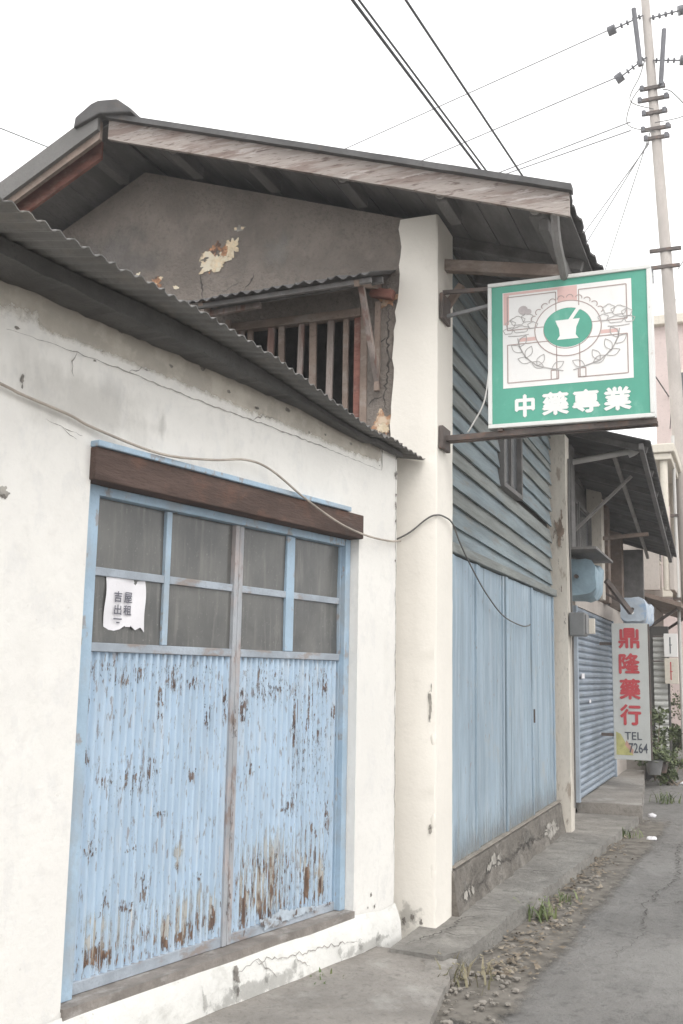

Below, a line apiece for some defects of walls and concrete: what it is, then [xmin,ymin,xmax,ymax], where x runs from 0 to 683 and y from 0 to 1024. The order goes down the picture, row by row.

spalling [199,225,246,274]
flaking render [371,408,391,434]
spalling [524,820,559,849]
corrosion [208,846,275,934]
corrosion [300,854,324,905]
spalling [487,852,502,873]
corrosion [83,919,109,970]
corrosion [160,900,189,952]
crack [236,939,362,976]